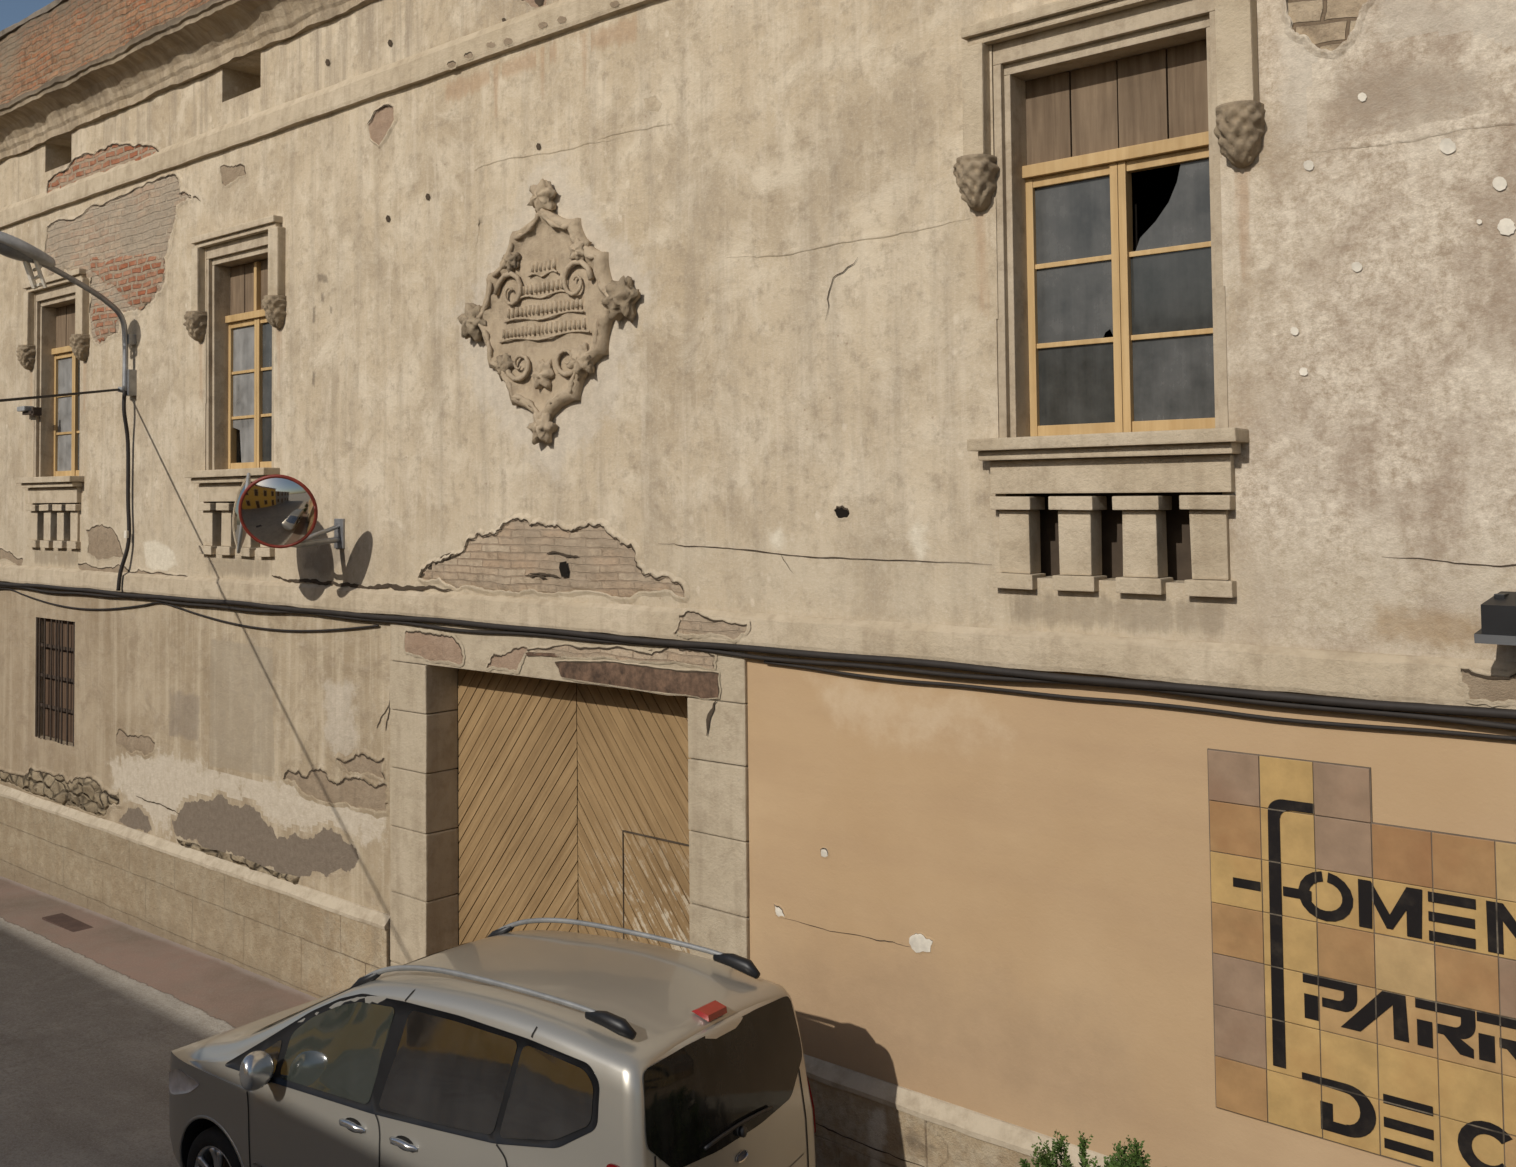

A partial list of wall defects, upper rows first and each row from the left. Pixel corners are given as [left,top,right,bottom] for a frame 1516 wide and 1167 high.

flaking render [1281,0,1375,59]
flaking render [367,102,398,149]
flaking render [46,140,162,194]
spalling [44,174,191,251]
flaking render [89,254,165,343]
flaking render [272,513,751,699]
flaking render [1457,665,1516,707]
spalling [0,768,119,798]
flaking render [282,747,390,819]
crack [785,918,909,947]